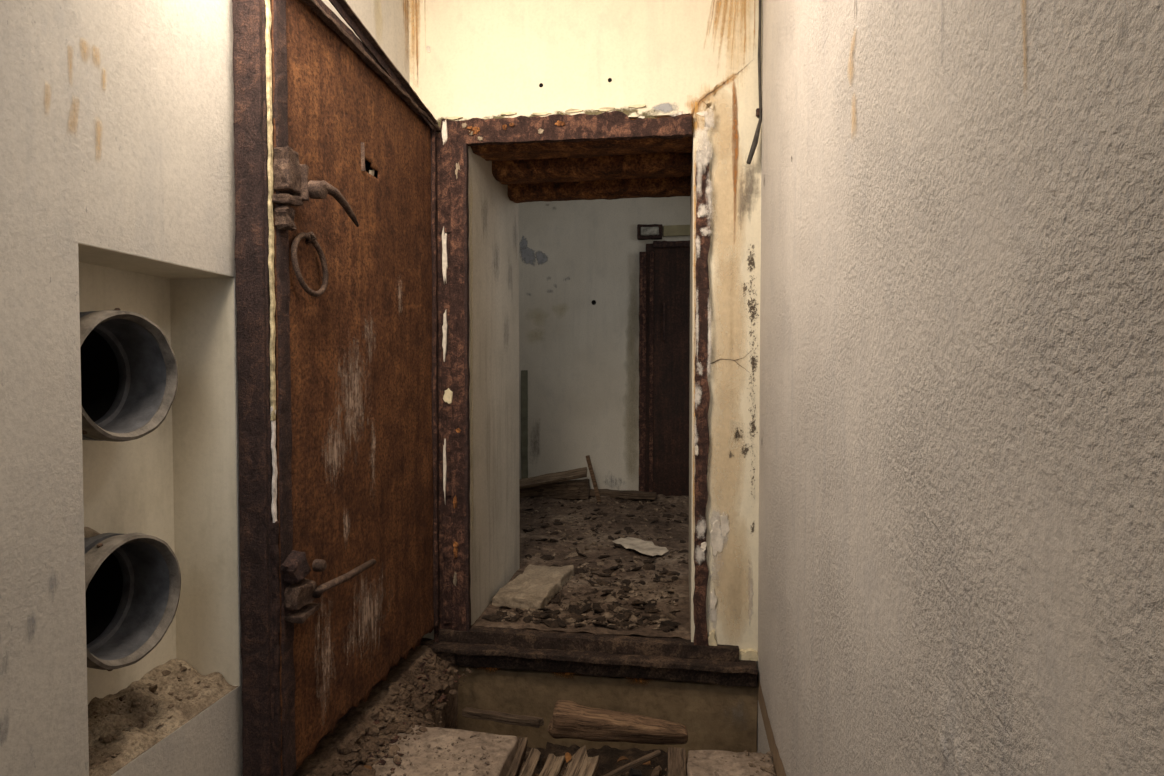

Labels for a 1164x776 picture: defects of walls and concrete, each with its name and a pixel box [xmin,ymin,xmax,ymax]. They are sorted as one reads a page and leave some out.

corrosion [405,0,418,67]
spalling [484,103,682,119]
peeling [695,107,741,253]
damp [740,169,754,213]
peeling [520,236,548,265]
peeling [694,282,742,403]
damp [729,245,759,499]
peeling [696,408,753,646]
corrosion [361,653,467,771]